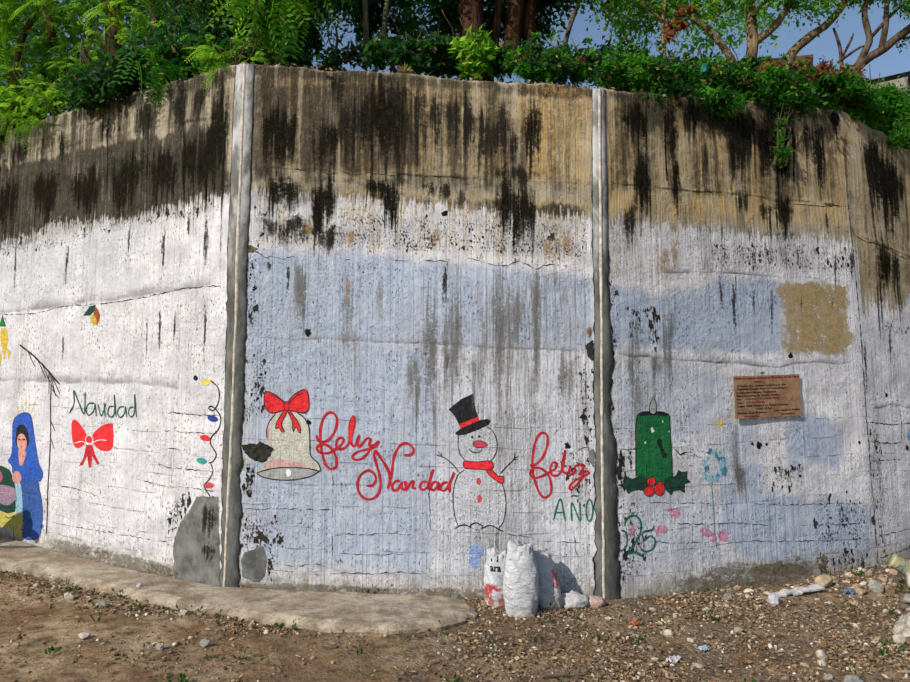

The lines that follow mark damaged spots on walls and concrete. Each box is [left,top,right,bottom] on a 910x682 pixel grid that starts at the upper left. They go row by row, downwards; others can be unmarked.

crack [5,285,221,315]
water stain [0,80,229,294]
water stain [263,71,541,254]
water stain [623,102,653,247]
water stain [718,276,737,329]
water stain [662,100,840,240]
water stain [770,255,854,356]
water stain [861,135,903,359]